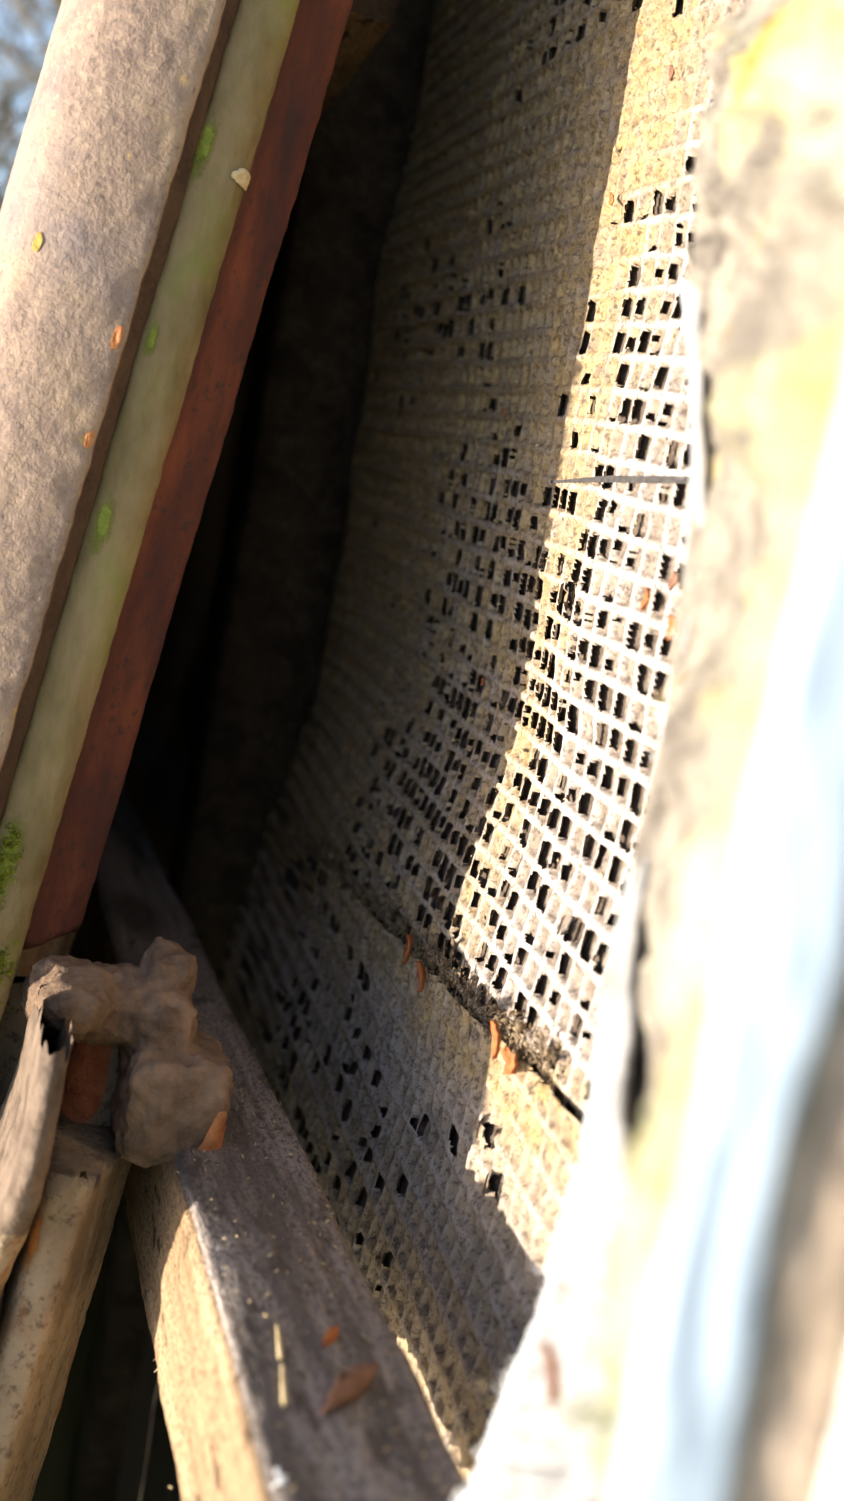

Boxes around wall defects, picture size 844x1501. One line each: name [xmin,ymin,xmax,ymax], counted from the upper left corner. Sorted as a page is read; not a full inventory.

peeling [556,913,583,944]
spalling [198,1111,227,1151]
peeling [475,1114,502,1205]